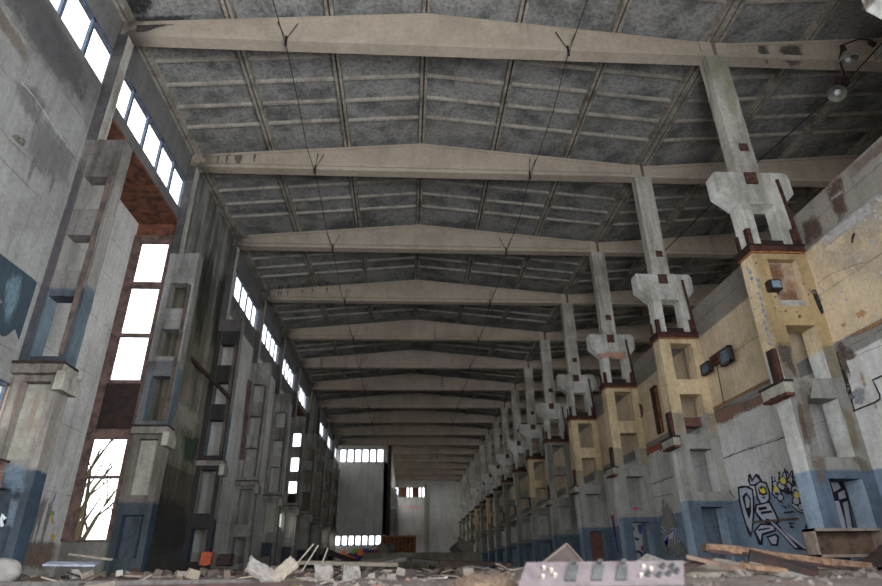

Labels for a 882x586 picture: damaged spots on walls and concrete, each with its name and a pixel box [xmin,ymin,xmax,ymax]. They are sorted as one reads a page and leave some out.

water stain [126,0,153,17]
peeling [0,254,37,339]
spalling [836,353,855,410]